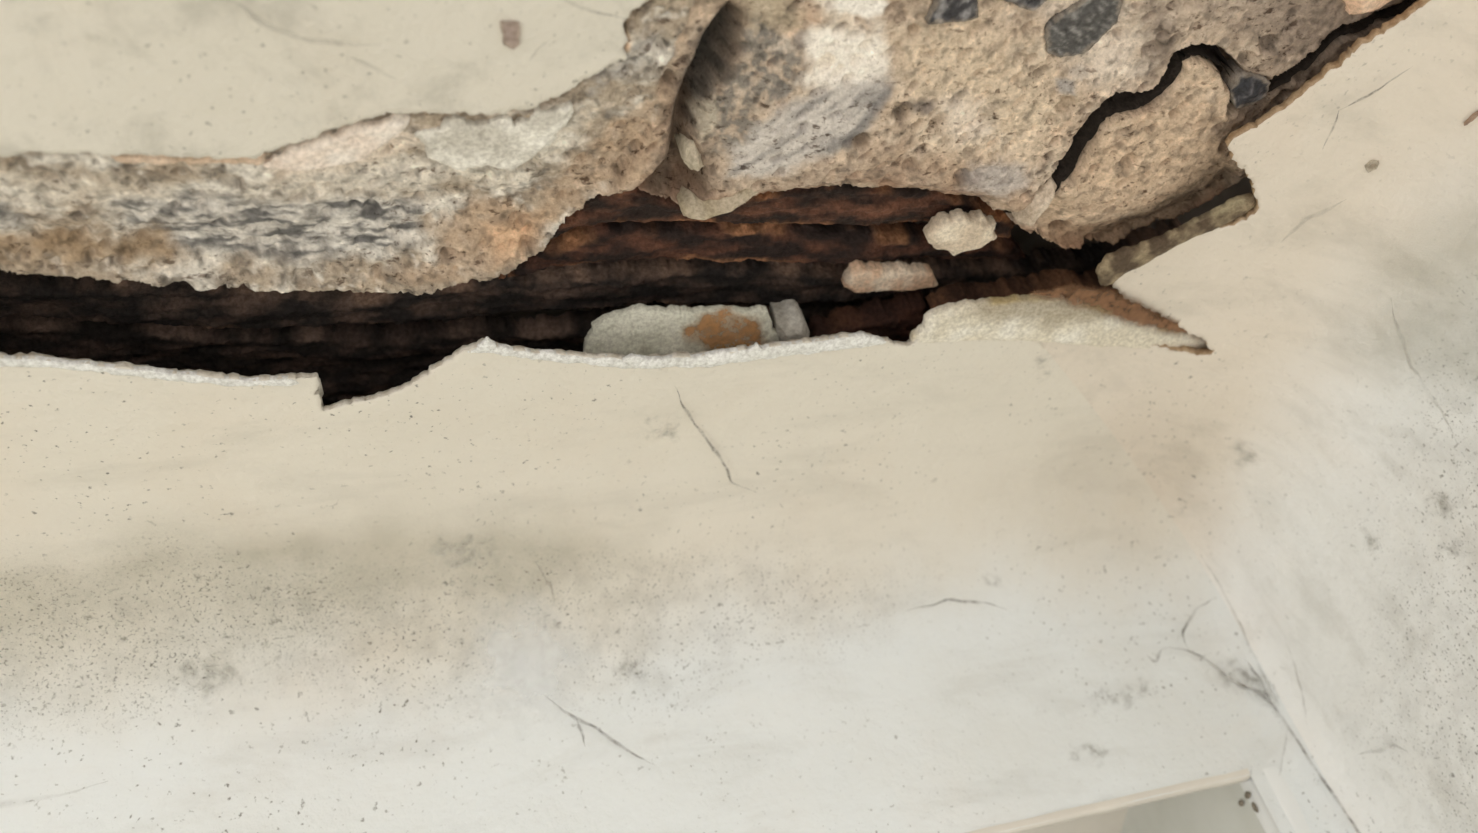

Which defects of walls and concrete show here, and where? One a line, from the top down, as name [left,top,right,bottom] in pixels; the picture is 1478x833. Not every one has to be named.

crack [1268,0,1416,92]
spalling [0,0,1419,296]
crack [1045,43,1234,193]
peeling [478,336,496,352]
peeling [622,353,645,367]
peeling [746,342,763,358]
peeling [909,293,1208,349]
crack [677,390,731,481]
water stain [0,584,255,671]
crack [1153,599,1277,710]
crack [547,697,641,758]
crack [1296,739,1358,832]